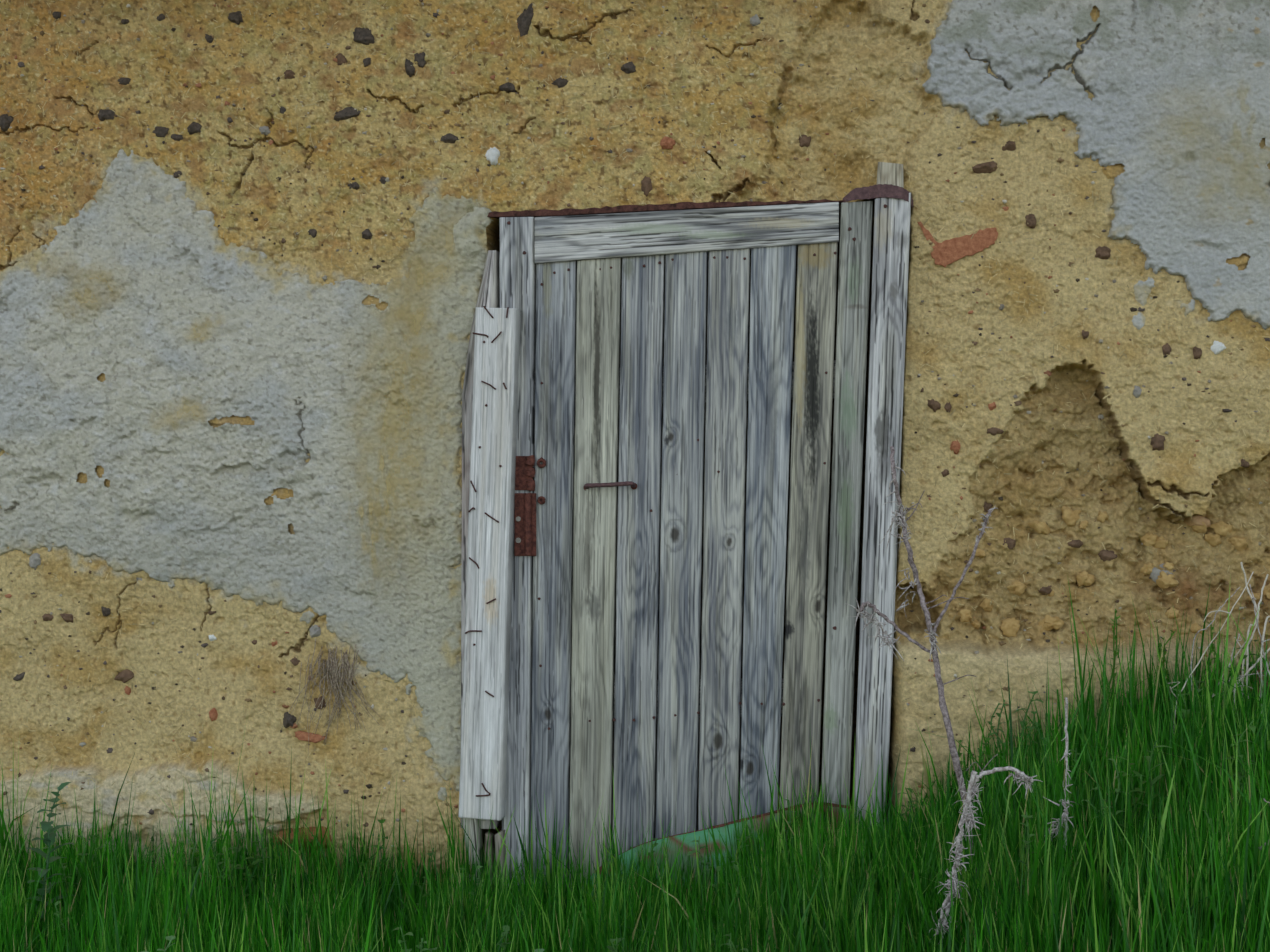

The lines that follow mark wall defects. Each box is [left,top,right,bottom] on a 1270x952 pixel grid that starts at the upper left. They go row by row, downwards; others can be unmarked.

crack [909,0,920,21]
crack [964,23,1101,102]
crack [0,95,99,136]
crack [217,108,314,195]
crack [365,85,536,134]
flaking render [726,0,1270,330]
flaking render [0,149,492,880]
spalling [894,359,1270,658]